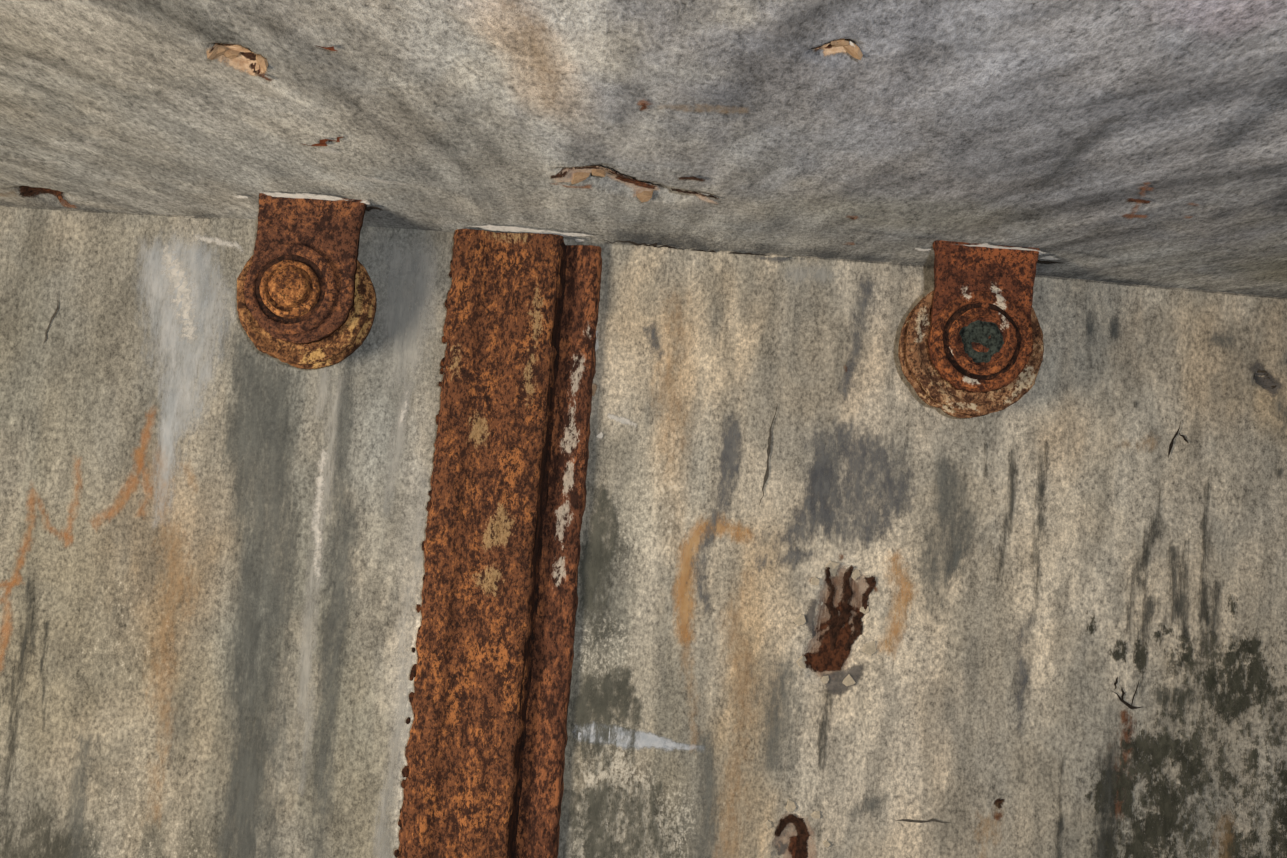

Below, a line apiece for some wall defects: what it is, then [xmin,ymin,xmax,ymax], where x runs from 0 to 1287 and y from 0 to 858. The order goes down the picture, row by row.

spalling [206,43,272,81]
spalling [815,38,863,60]
spalling [551,166,719,204]
corrosion [438,336,447,387]
corrosion [406,647,417,724]
water stain [1079,483,1287,858]
corrosion [401,766,409,789]
water stain [570,668,679,858]
water stain [664,741,714,847]